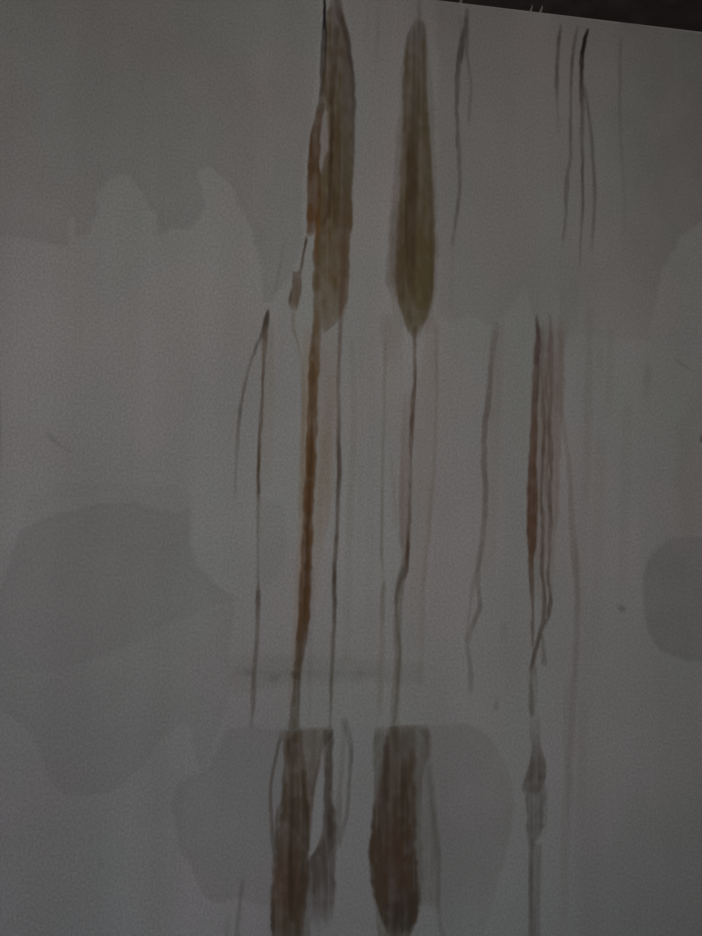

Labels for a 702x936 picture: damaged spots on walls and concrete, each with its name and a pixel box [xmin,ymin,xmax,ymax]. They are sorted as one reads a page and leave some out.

rust [303,0,353,312]
rust [397,31,434,335]
water stain [580,30,588,89]
rust [295,331,319,687]
rust [527,387,552,615]
rust [271,724,336,936]
rust [369,749,418,933]